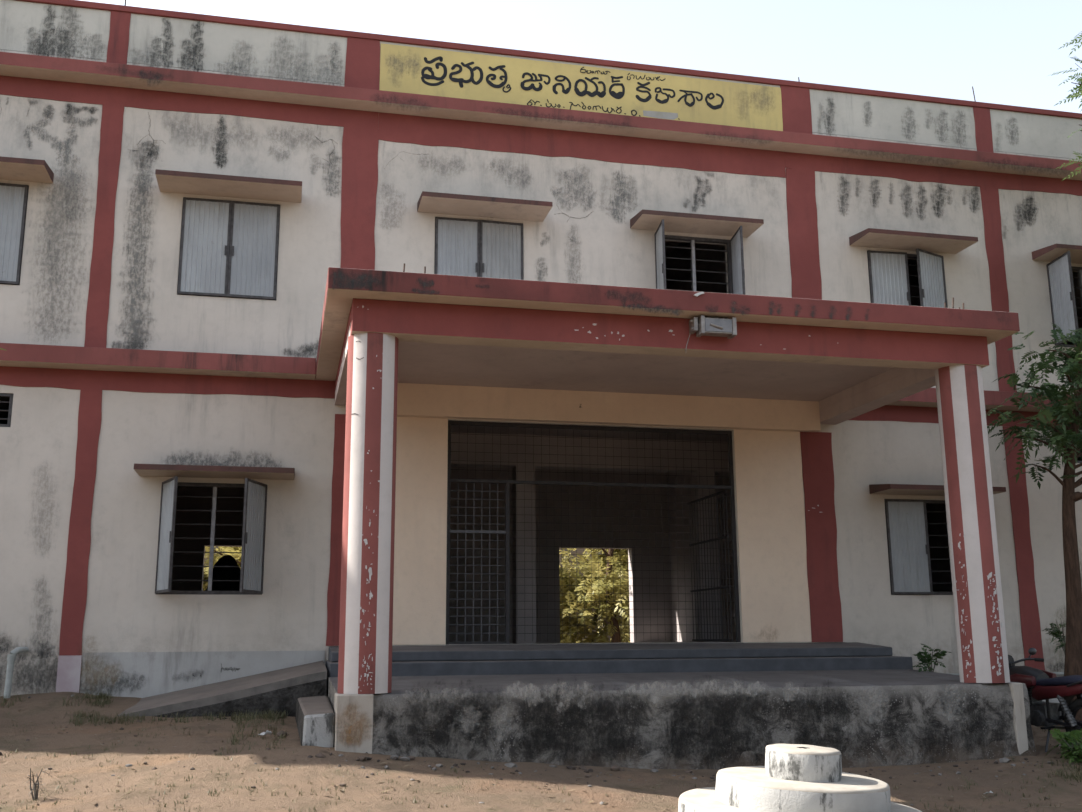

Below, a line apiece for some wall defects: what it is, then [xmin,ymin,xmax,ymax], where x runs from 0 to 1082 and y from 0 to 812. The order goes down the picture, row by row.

damp [29,6,72,57]
damp [140,19,203,83]
damp [25,105,95,162]
damp [216,117,226,168]
damp [610,173,626,220]
damp [903,186,944,217]
damp [1017,198,1036,228]
damp [112,143,154,349]
peeling [357,564,375,689]
peeling [956,534,976,678]
peeling [987,572,1003,676]
damp [405,680,770,764]